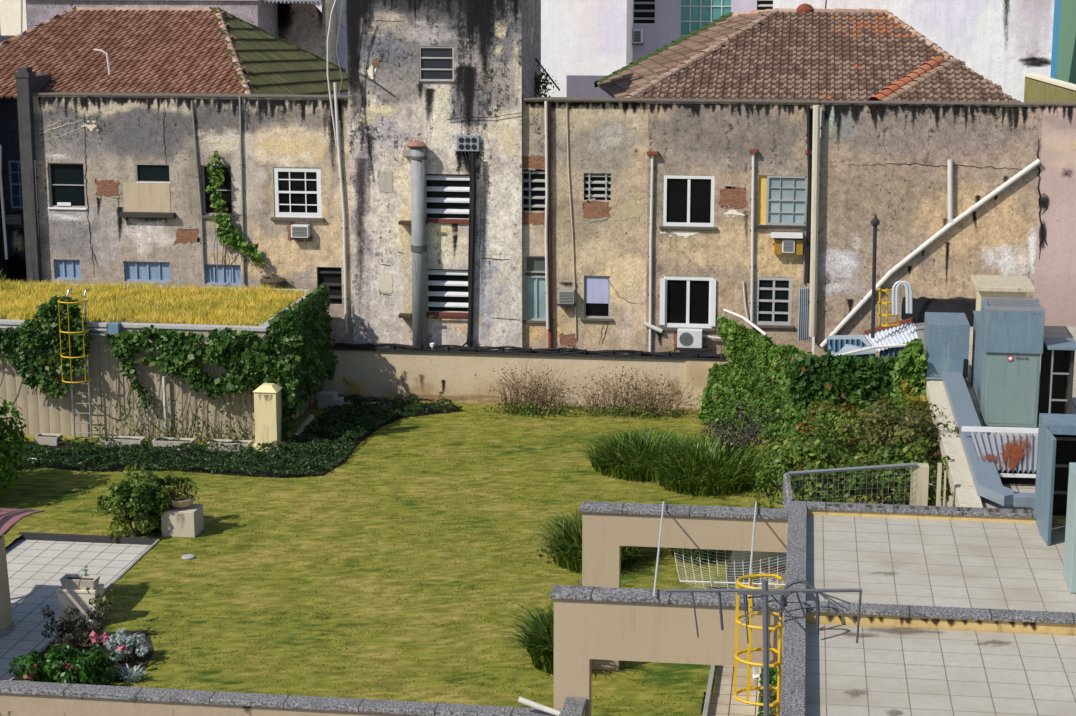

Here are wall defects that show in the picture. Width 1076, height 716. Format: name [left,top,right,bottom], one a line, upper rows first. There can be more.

damp [447,0,518,134]
damp [38,0,371,171]
damp [417,83,434,119]
damp [525,102,1073,172]
crack [38,110,98,276]
spalling [95,178,121,199]
spalling [581,198,617,222]
spalling [717,185,749,217]
damp [1039,194,1049,210]
spalling [173,226,200,245]
damp [1027,223,1046,275]
corrosion [979,435,1031,470]